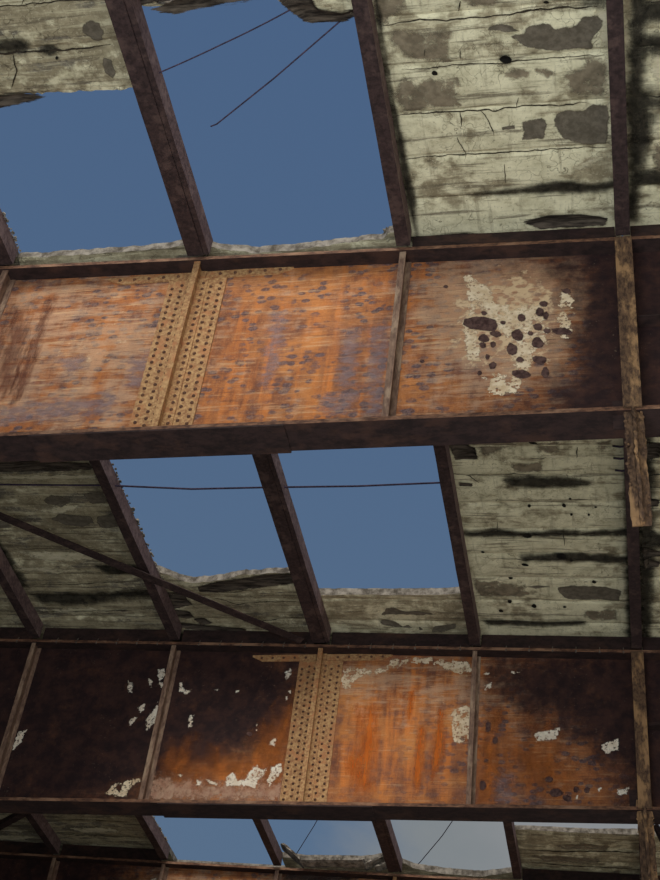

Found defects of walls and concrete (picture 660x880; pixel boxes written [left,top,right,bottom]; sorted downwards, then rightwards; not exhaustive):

water stain [376,0,416,228]
water stain [626,0,660,221]
water stain [475,181,613,196]
corrosion [0,303,50,399]
corrosion [463,301,572,378]
peeling [462,275,575,396]
water stain [504,475,590,488]
spalling [198,574,293,593]
water stain [464,479,631,637]
peeling [105,778,140,797]
peeling [196,763,282,788]
corrosion [545,777,590,802]